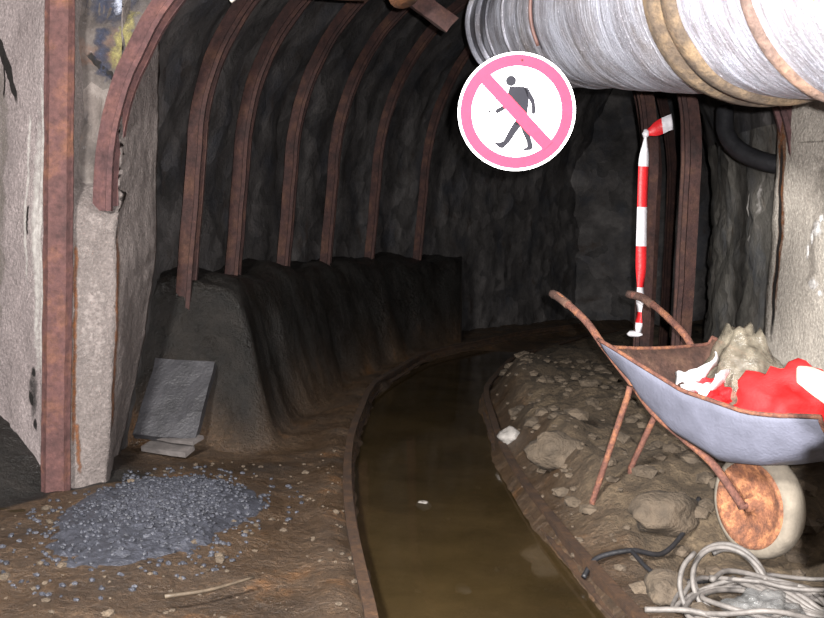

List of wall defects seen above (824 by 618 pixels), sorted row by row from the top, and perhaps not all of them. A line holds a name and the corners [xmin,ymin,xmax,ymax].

crack [0,39,17,100]
damp [94,0,136,76]